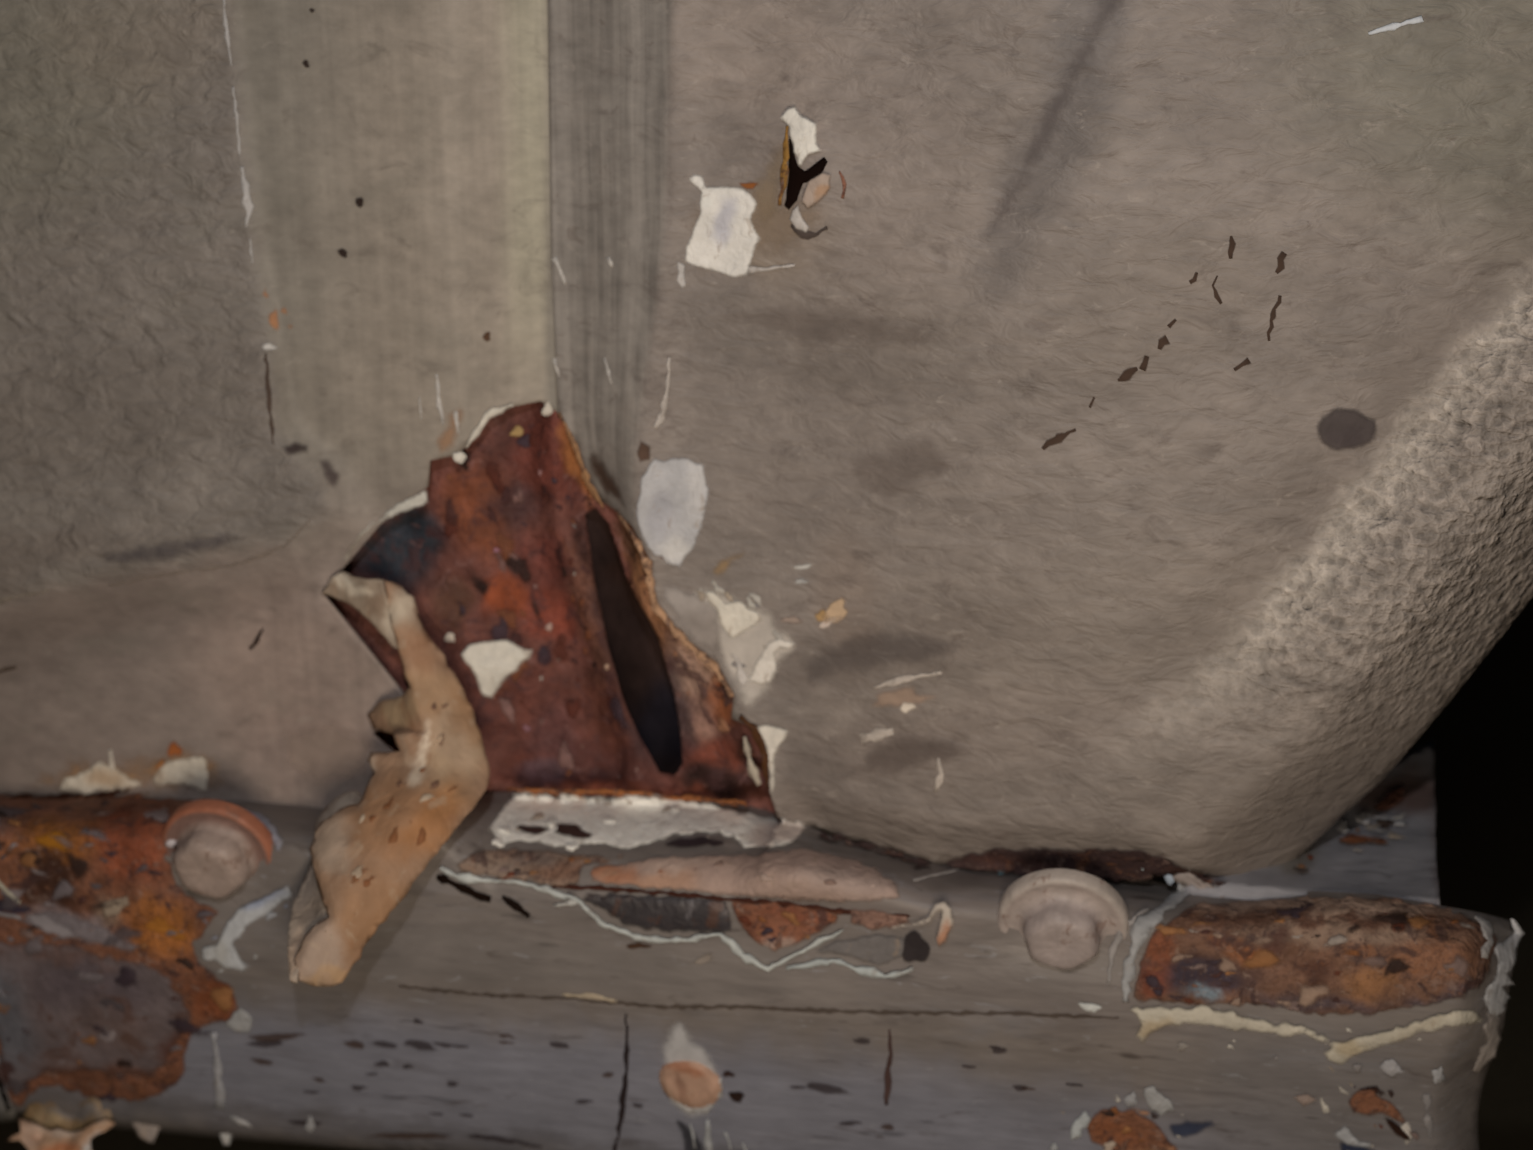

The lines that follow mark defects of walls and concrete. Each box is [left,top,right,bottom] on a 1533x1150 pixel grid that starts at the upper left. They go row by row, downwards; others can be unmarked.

crack [223,0,254,264]
peeling [677,175,795,287]
peeling [802,173,830,208]
water stain [1319,409,1375,450]
rust [557,412,734,698]
peeling [60,742,213,794]
peeling [288,491,953,987]
rust [507,787,748,807]
rust [0,788,291,1145]
rust [820,832,1525,1150]
peeling [6,1096,161,1150]
crack [613,1013,629,1150]